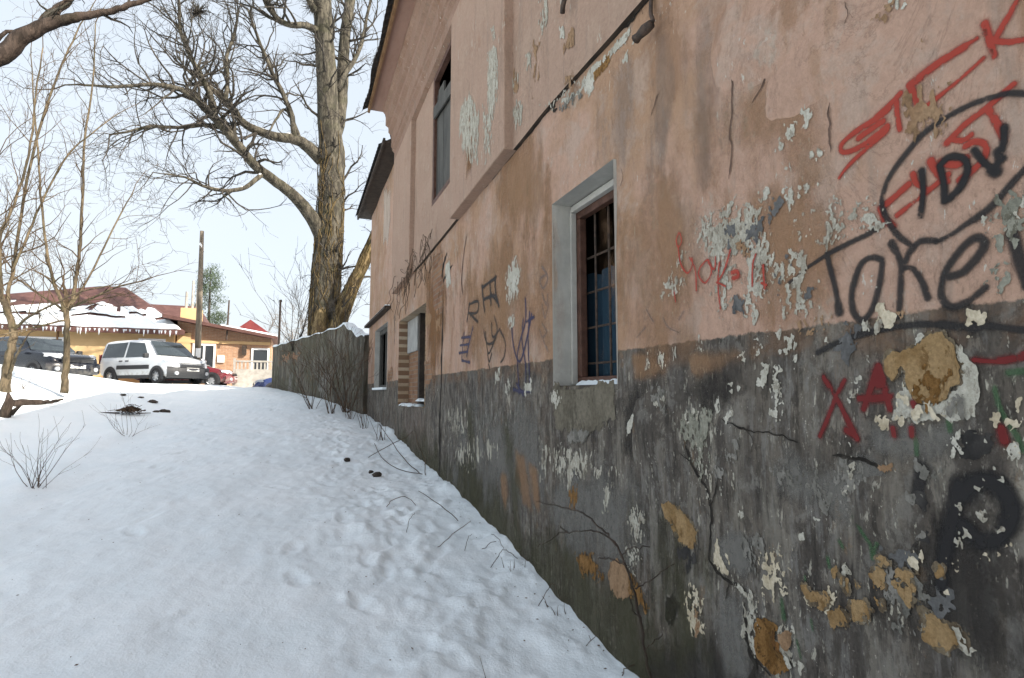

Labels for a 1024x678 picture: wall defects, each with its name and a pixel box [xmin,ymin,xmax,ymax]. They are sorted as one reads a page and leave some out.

peeling [459,25,498,166]
peeling [539,27,634,113]
crack [729,78,765,175]
flaking render [660,163,987,481]
water stain [453,394,641,564]
crack [722,419,798,450]
crack [833,453,878,469]
flaking render [576,504,649,615]
water stain [645,589,748,678]
crack [681,443,771,678]
flaking render [661,501,806,678]
flaking render [800,490,977,658]